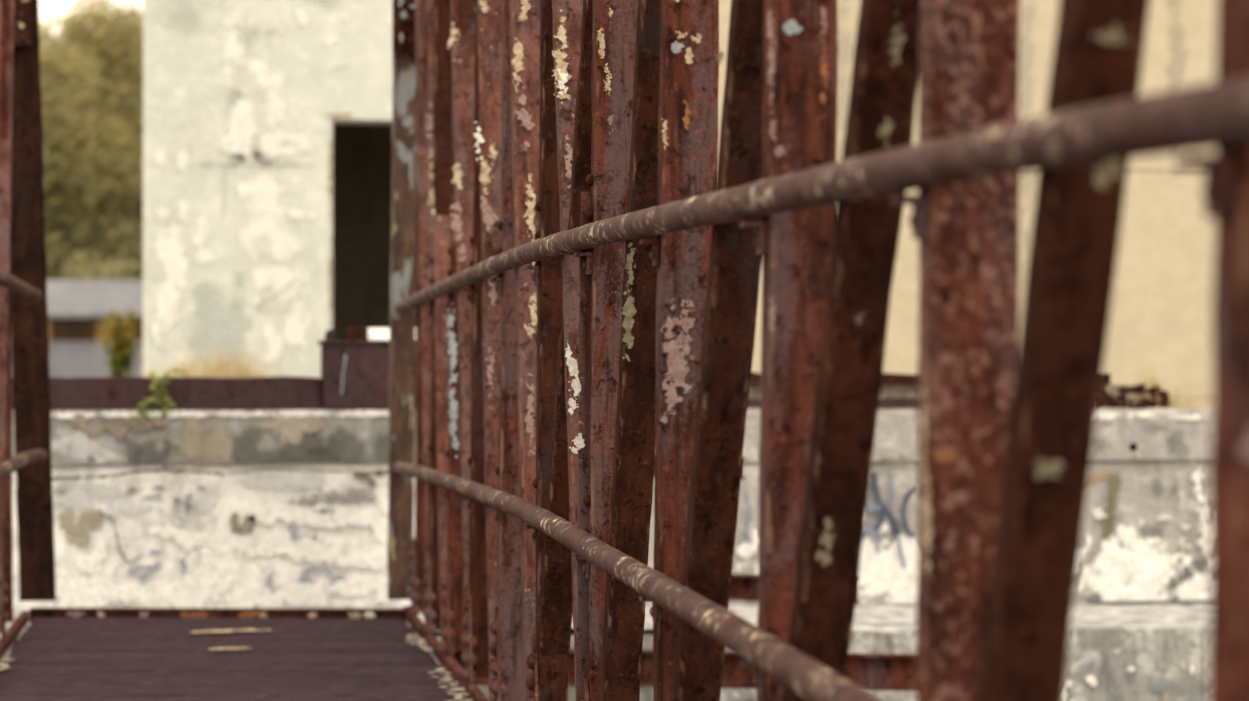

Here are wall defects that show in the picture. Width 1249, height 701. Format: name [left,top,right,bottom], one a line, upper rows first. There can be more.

peeling [511,38,535,151]
peeling [552,10,572,100]
peeling [596,8,614,95]
peeling [670,31,702,66]
peeling [425,100,468,262]
peeling [474,122,498,233]
peeling [523,173,536,241]
peeling [446,303,460,458]
peeling [565,343,582,415]
peeling [660,299,695,423]
rust [1098,383,1169,409]
damp [51,410,392,608]